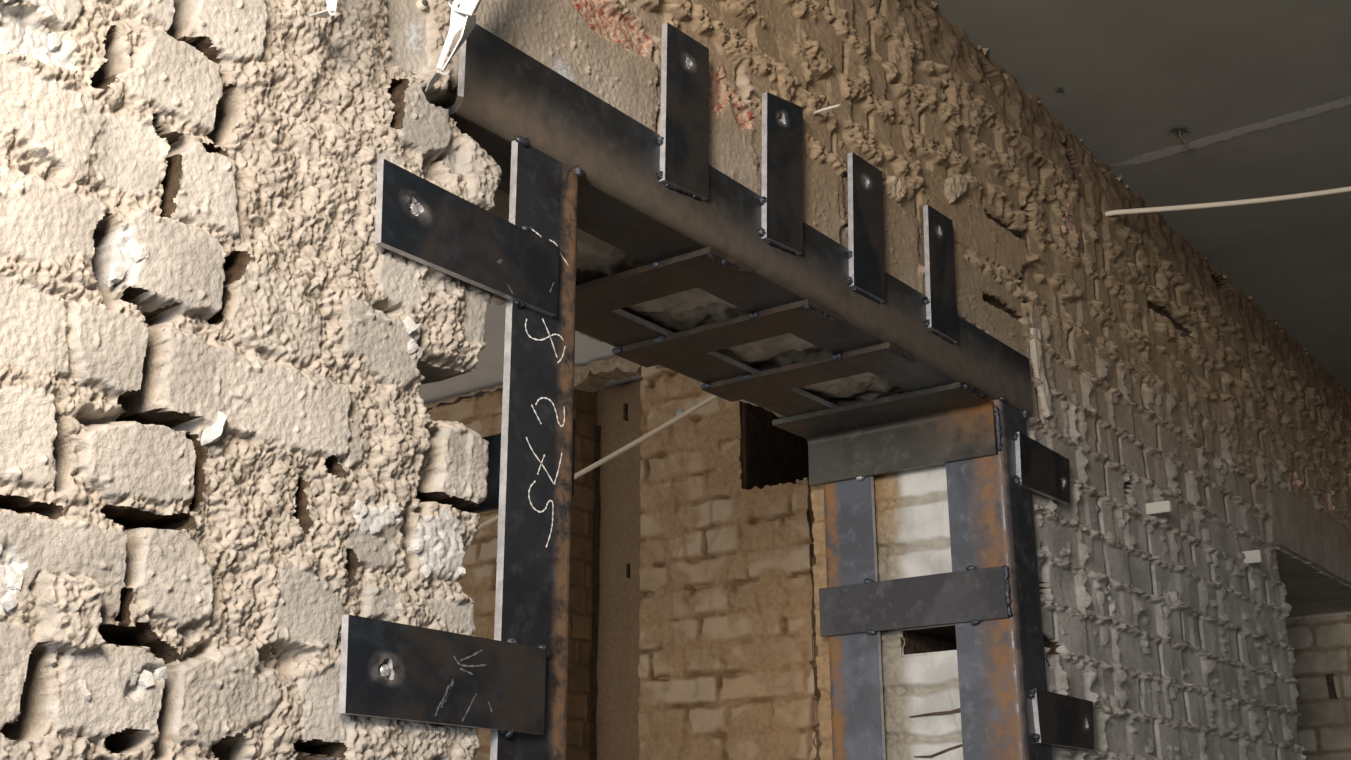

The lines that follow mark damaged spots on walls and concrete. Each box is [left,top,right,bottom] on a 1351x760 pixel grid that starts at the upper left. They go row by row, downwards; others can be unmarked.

spalling [0,0,79,73]
spalling [569,0,653,57]
spalling [91,223,149,290]
spalling [402,316,423,360]
crack [1148,300,1194,338]
spalling [200,411,227,447]
spalling [353,499,402,535]
spalling [406,508,466,581]
spalling [0,543,28,614]
spalling [124,663,167,700]